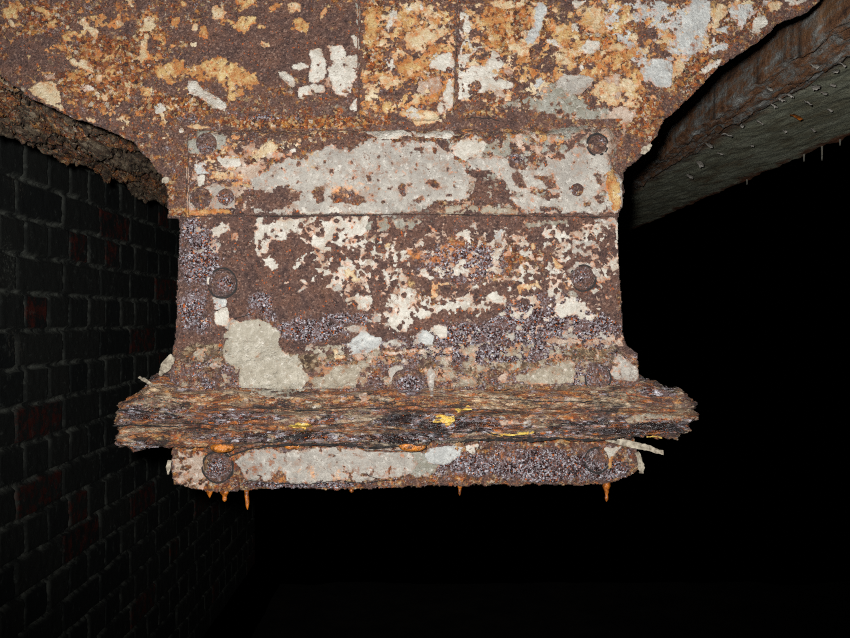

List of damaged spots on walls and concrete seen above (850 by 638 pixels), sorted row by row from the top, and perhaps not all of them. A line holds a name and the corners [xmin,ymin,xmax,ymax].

peeling [1,0,806,408]
peeling [625,410,699,424]
peeling [235,443,479,485]
corrosion [605,439,664,473]